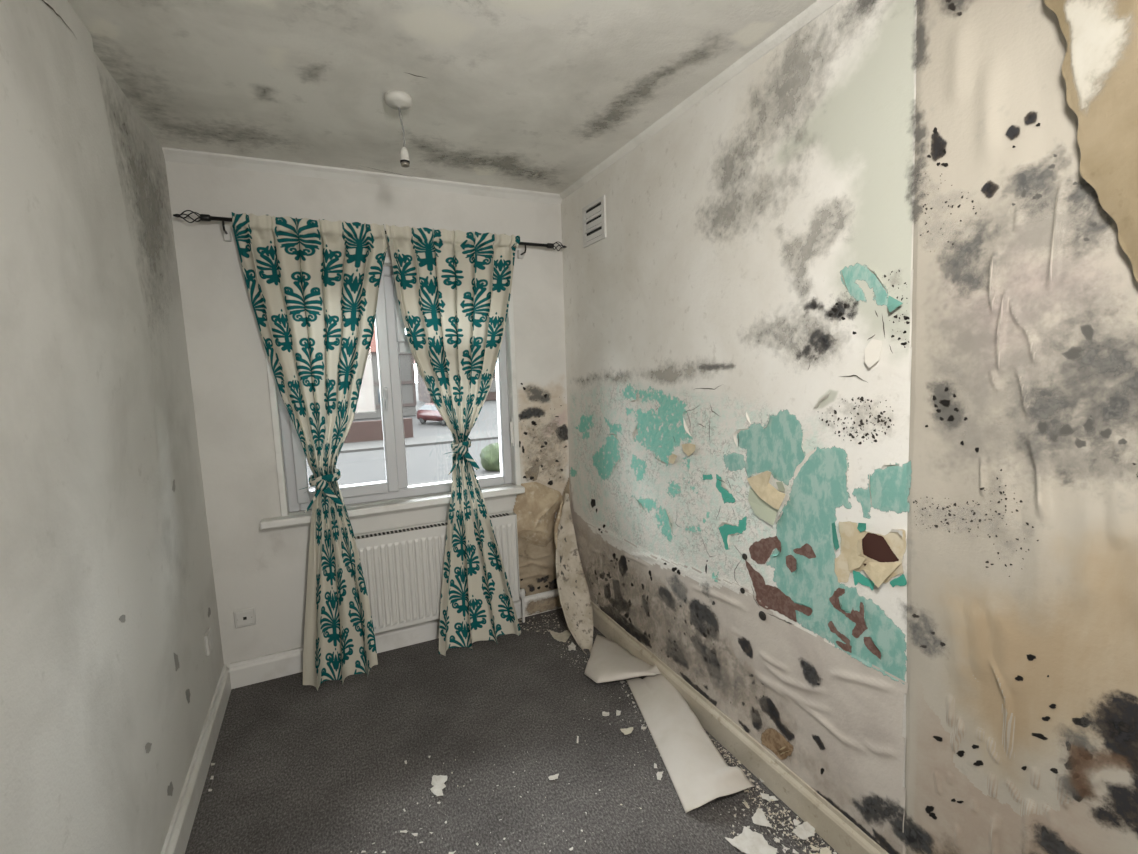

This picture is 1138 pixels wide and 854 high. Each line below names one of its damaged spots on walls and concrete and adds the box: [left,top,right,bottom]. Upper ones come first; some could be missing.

leakage [594,51,706,129]
leakage [420,146,546,179]
leakage [712,0,1138,458]
leakage [510,370,570,495]
leakage [520,556,577,615]
peeling [549,630,576,651]
leakage [592,553,794,760]
peeling [567,370,912,684]
leakage [800,660,821,687]
leakage [816,469,1138,854]